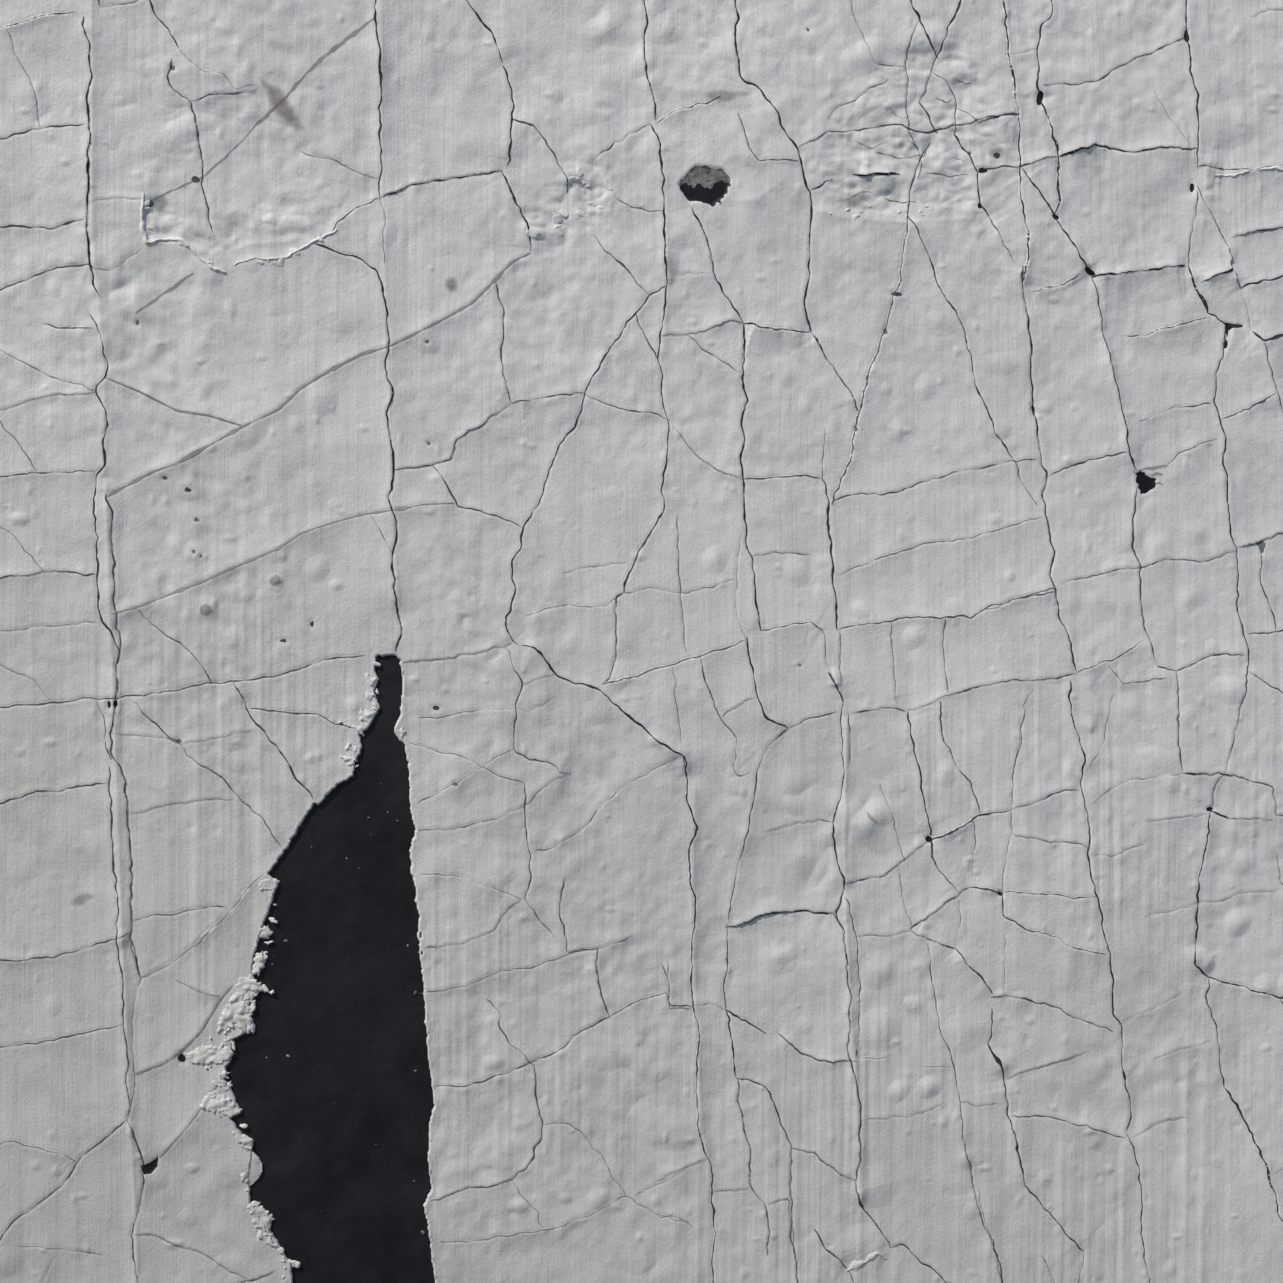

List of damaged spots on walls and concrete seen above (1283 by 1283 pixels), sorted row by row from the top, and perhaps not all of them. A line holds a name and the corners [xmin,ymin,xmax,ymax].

crack [0,0,260,296]
crack [303,0,472,229]
crack [466,0,568,192]
spalling [678,165,730,205]
crack [0,236,854,1283]
crack [687,0,1249,1061]
spalling [1135,465,1166,494]
crack [1086,303,1283,942]
peeling [184,655,435,1283]
crack [703,943,947,1283]
crack [987,1012,1188,1283]
crack [1154,950,1283,1221]